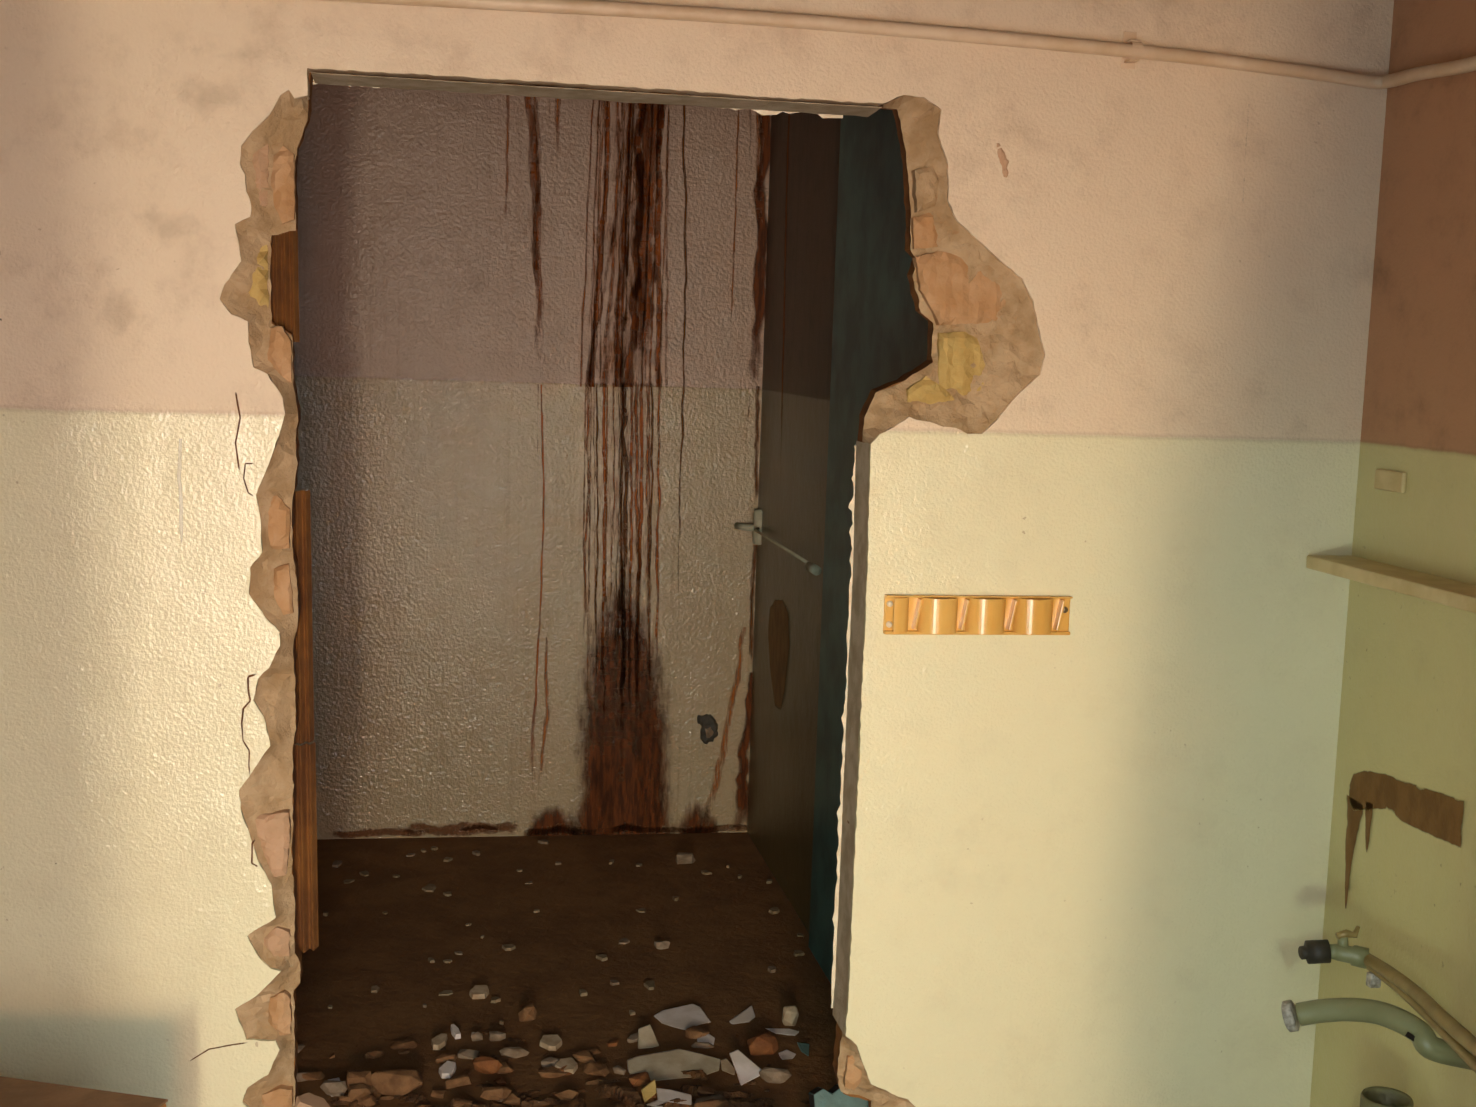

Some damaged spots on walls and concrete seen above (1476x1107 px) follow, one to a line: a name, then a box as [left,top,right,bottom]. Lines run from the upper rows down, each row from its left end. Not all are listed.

spalling [220,70,319,1107]
corrosion [505,95,561,329]
corrosion [527,100,757,836]
hole [697,714,718,744]
corrosion [731,110,790,496]
spalling [831,95,1044,1008]
spalling [837,1032,915,1107]